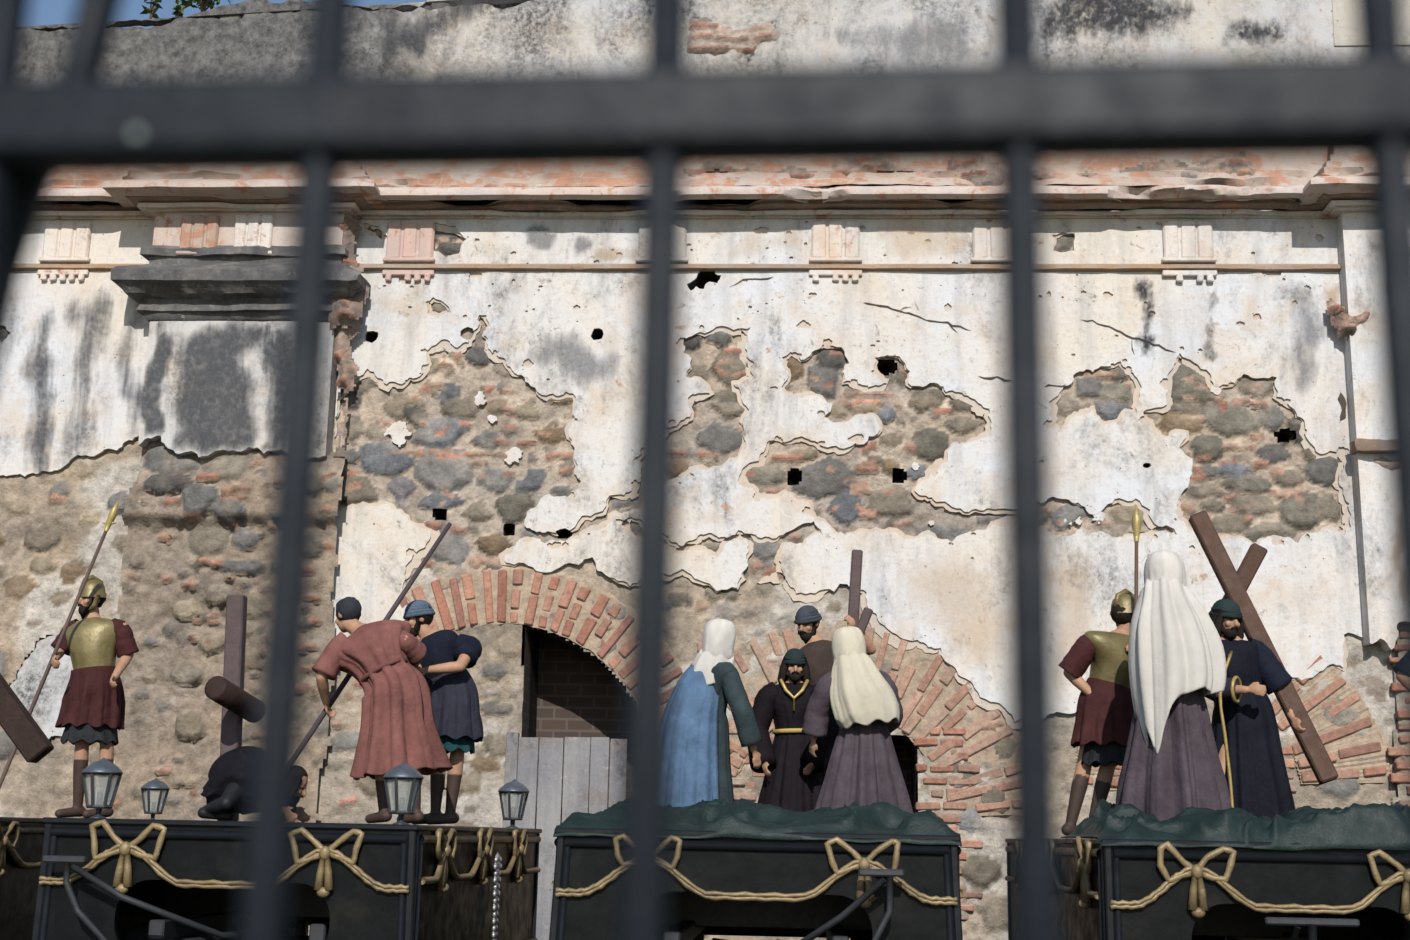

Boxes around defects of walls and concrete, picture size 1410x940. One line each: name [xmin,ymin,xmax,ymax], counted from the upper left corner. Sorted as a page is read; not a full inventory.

damp [26,320,52,472]
damp [71,300,107,389]
damp [120,323,284,450]
flaking render [332,212,631,603]
flaking render [673,331,1004,695]
crack [863,302,968,333]
flaking render [1051,358,1344,543]
flaking render [10,635,73,741]
flaking render [316,558,628,828]
flaking render [932,681,1010,940]
flaking render [1056,712,1119,839]
flaking render [1266,633,1399,809]